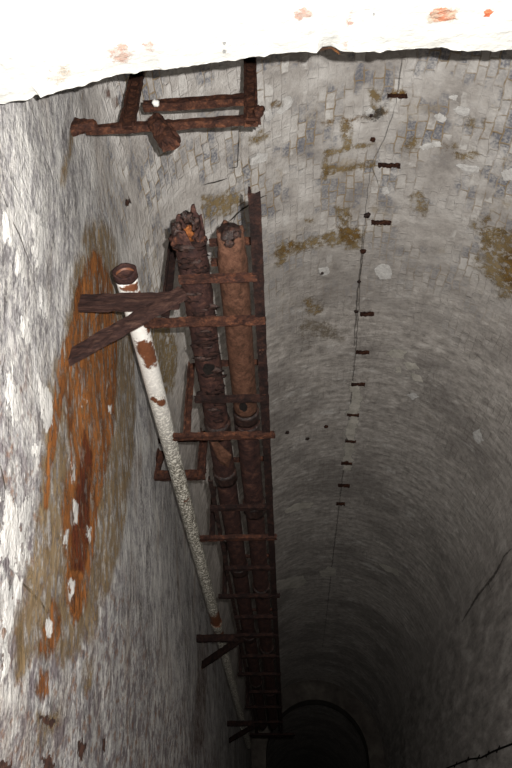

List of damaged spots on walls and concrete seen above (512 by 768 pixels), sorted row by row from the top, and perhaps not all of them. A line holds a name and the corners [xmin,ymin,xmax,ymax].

leakage [368,90,387,121]
leakage [322,118,375,180]
leakage [276,206,360,265]
leakage [473,216,512,298]
rust [16,224,136,699]